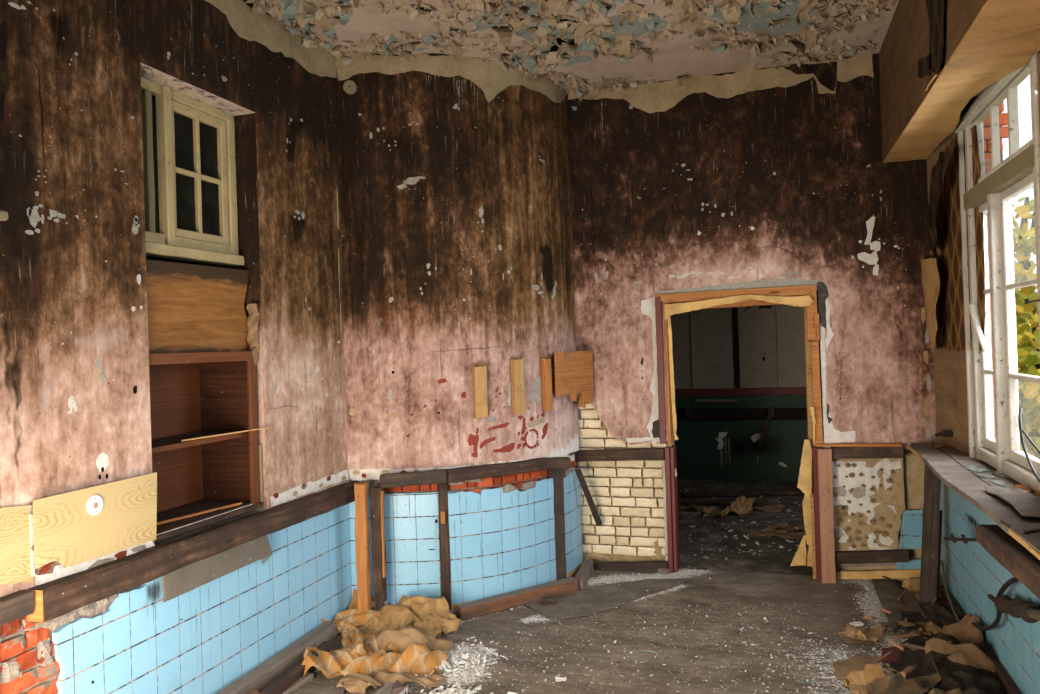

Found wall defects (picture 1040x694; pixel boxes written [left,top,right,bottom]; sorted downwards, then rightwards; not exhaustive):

peeling [245,0,894,111]
peeling [25,191,68,235]
peeling [397,176,426,189]
damp [542,247,553,290]
peeling [852,216,900,276]
damp [4,323,19,405]
flaking render [270,264,817,560]
spalling [832,458,905,551]
flaking render [0,593,119,694]